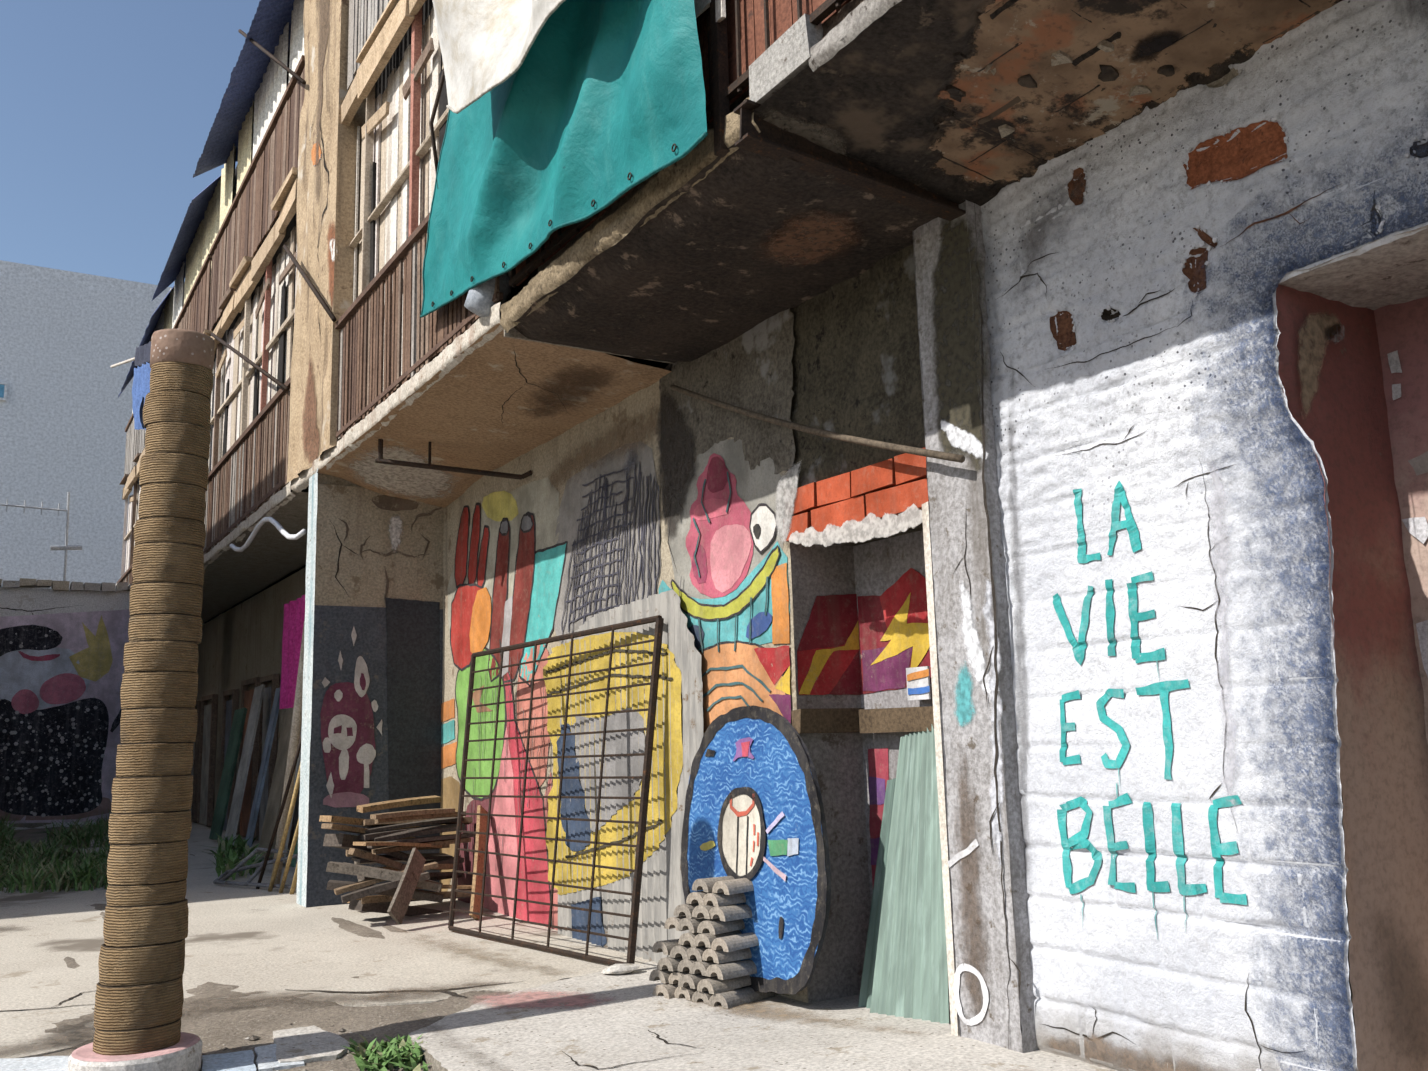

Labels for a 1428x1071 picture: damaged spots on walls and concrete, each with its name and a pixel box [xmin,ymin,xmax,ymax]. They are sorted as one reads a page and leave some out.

damp [1131,31,1184,61]
spalling [929,0,1337,189]
spalling [1065,167,1087,205]
spalling [1181,225,1218,298]
spalling [1049,309,1077,351]
damp [535,369,608,415]
crack [329,519,358,595]
crack [952,204,1193,1048]
crack [1170,464,1237,828]
crack [562,1030,705,1069]
crack [1245,974,1303,1069]